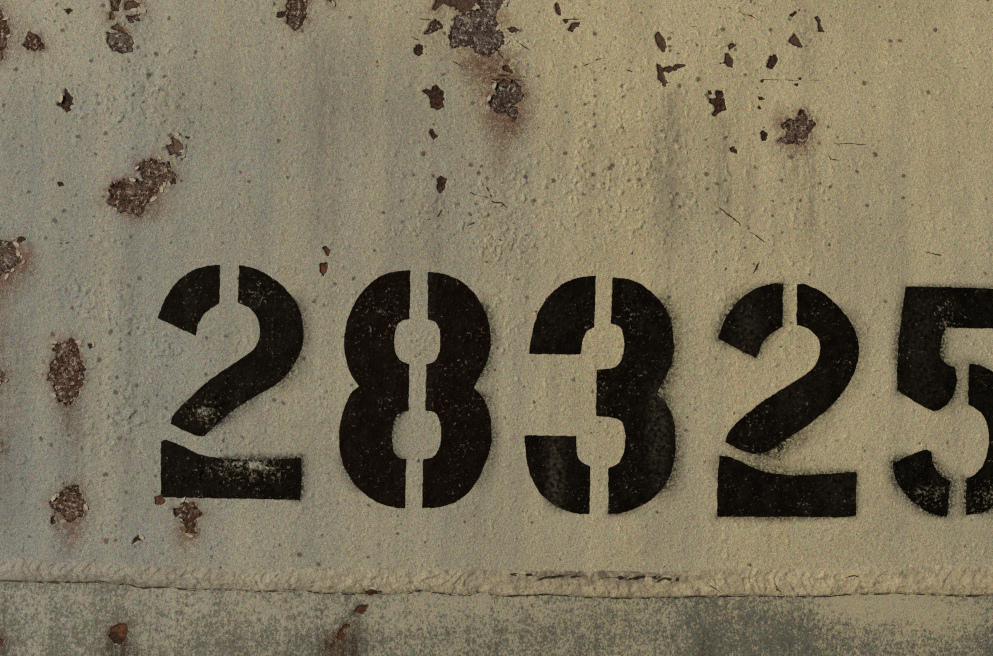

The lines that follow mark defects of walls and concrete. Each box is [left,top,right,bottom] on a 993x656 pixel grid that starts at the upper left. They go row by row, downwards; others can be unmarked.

peeling [419,85,444,110]
peeling [166,132,190,158]
corrosion [354,589,382,614]
corrosion [108,623,127,656]
corrosion [325,624,356,656]